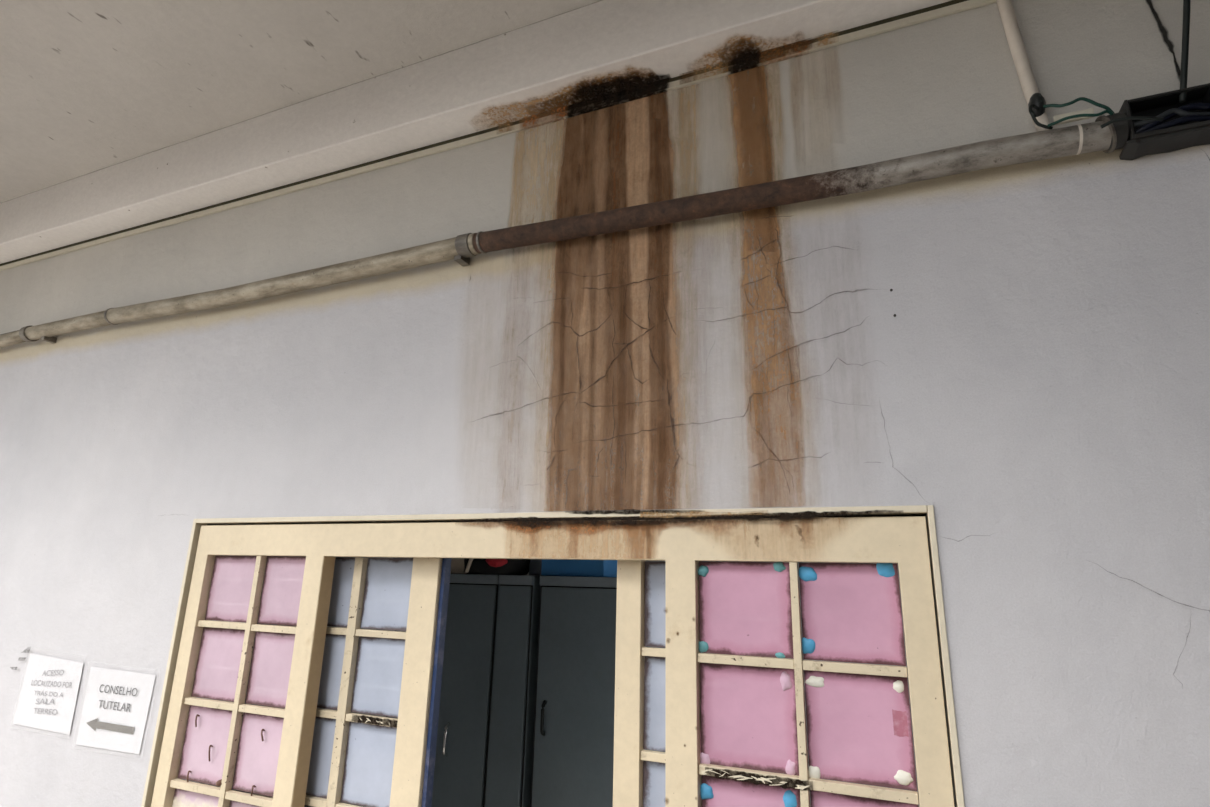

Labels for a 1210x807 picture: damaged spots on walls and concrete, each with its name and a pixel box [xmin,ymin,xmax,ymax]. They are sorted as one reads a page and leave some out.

rust [556,92,674,219]
water stain [483,32,834,132]
rust [728,65,781,187]
rust [473,223,680,559]
crack [491,216,848,504]
rust [741,206,799,488]